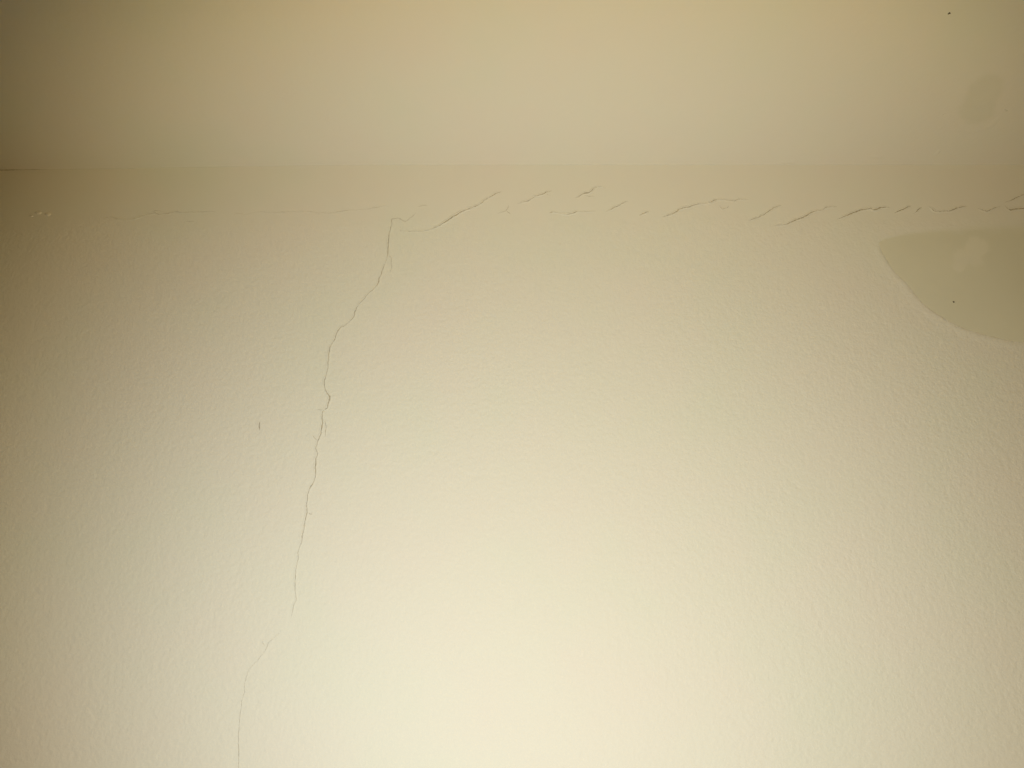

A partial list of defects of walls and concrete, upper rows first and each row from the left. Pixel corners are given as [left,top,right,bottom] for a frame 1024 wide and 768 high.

crack [290,185,1024,618]